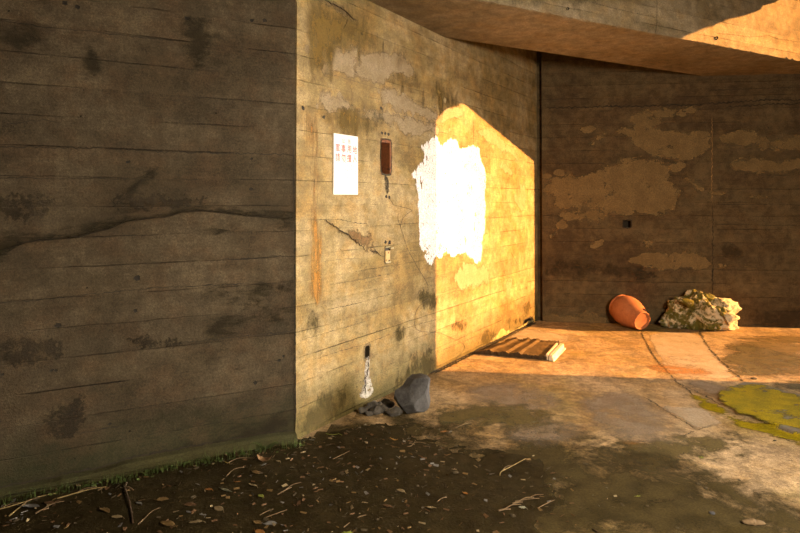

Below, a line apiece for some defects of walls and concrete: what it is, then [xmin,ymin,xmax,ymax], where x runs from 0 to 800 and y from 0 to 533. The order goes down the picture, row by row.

peeling [542,106,800,238]
crack [1,209,285,251]
corrosion [311,181,321,305]
spalling [326,220,381,256]
peeling [628,239,728,272]
crack [641,330,720,405]
crack [699,331,749,379]
crack [646,398,713,437]